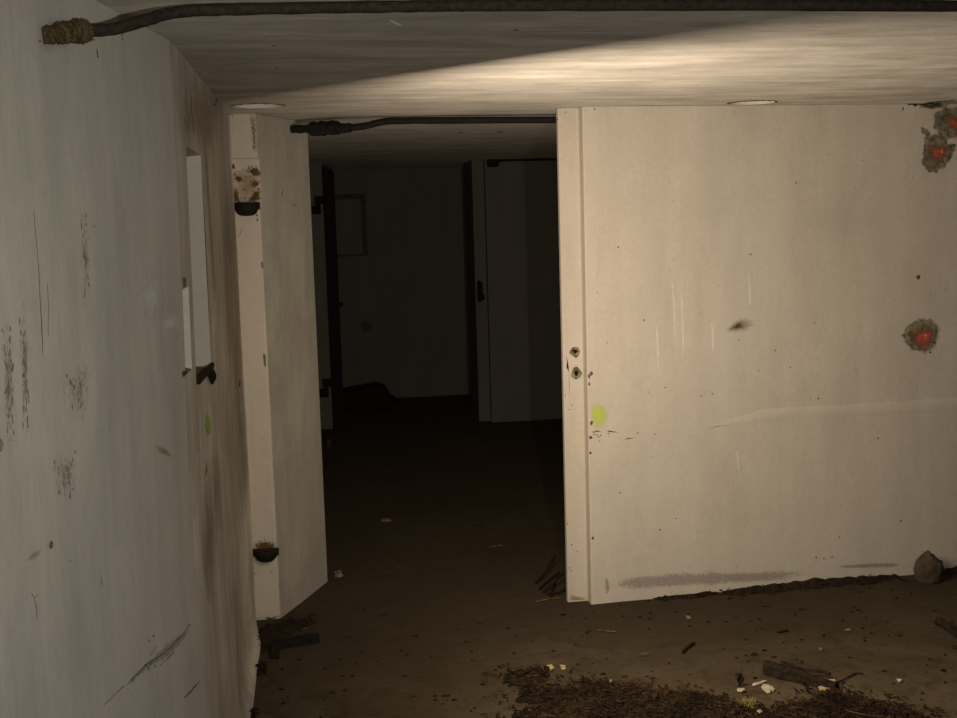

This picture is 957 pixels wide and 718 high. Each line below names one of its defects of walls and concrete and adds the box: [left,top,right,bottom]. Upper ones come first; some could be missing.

spalling [921,100,957,173]
spalling [902,319,937,353]
crack [104,623,194,706]